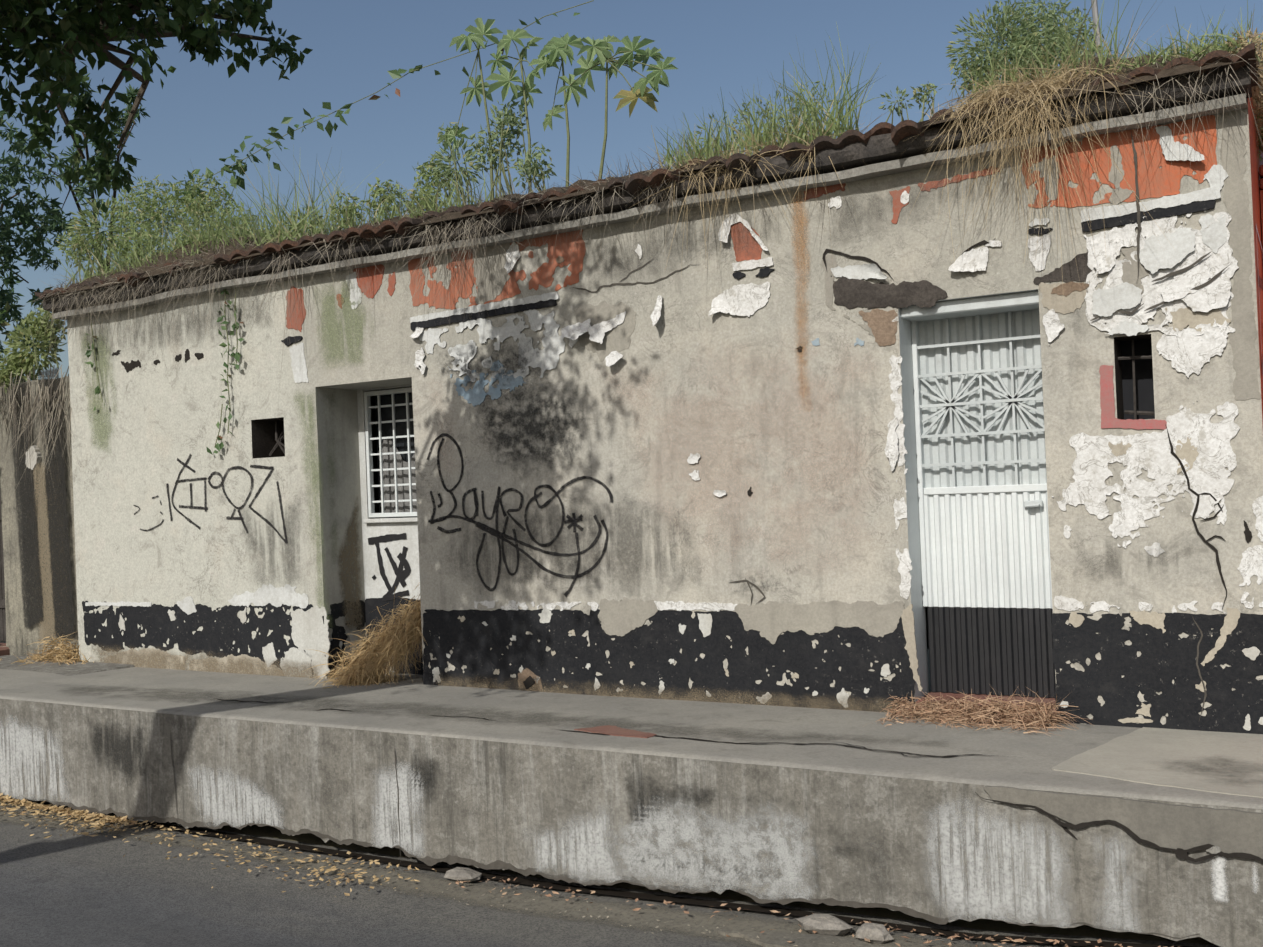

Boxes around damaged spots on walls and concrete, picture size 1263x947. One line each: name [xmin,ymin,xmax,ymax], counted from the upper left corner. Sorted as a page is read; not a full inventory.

peeling [387,229,663,407]
water stain [479,393,577,466]
crack [572,258,691,293]
spalling [708,213,775,317]
spalling [822,249,948,529]
peeling [948,239,1002,272]
peeling [1020,110,1262,557]
peeling [85,601,152,631]
peeling [103,584,365,679]
spalling [458,540,923,691]
peeling [1054,496,1263,666]
crack [1165,424,1227,720]